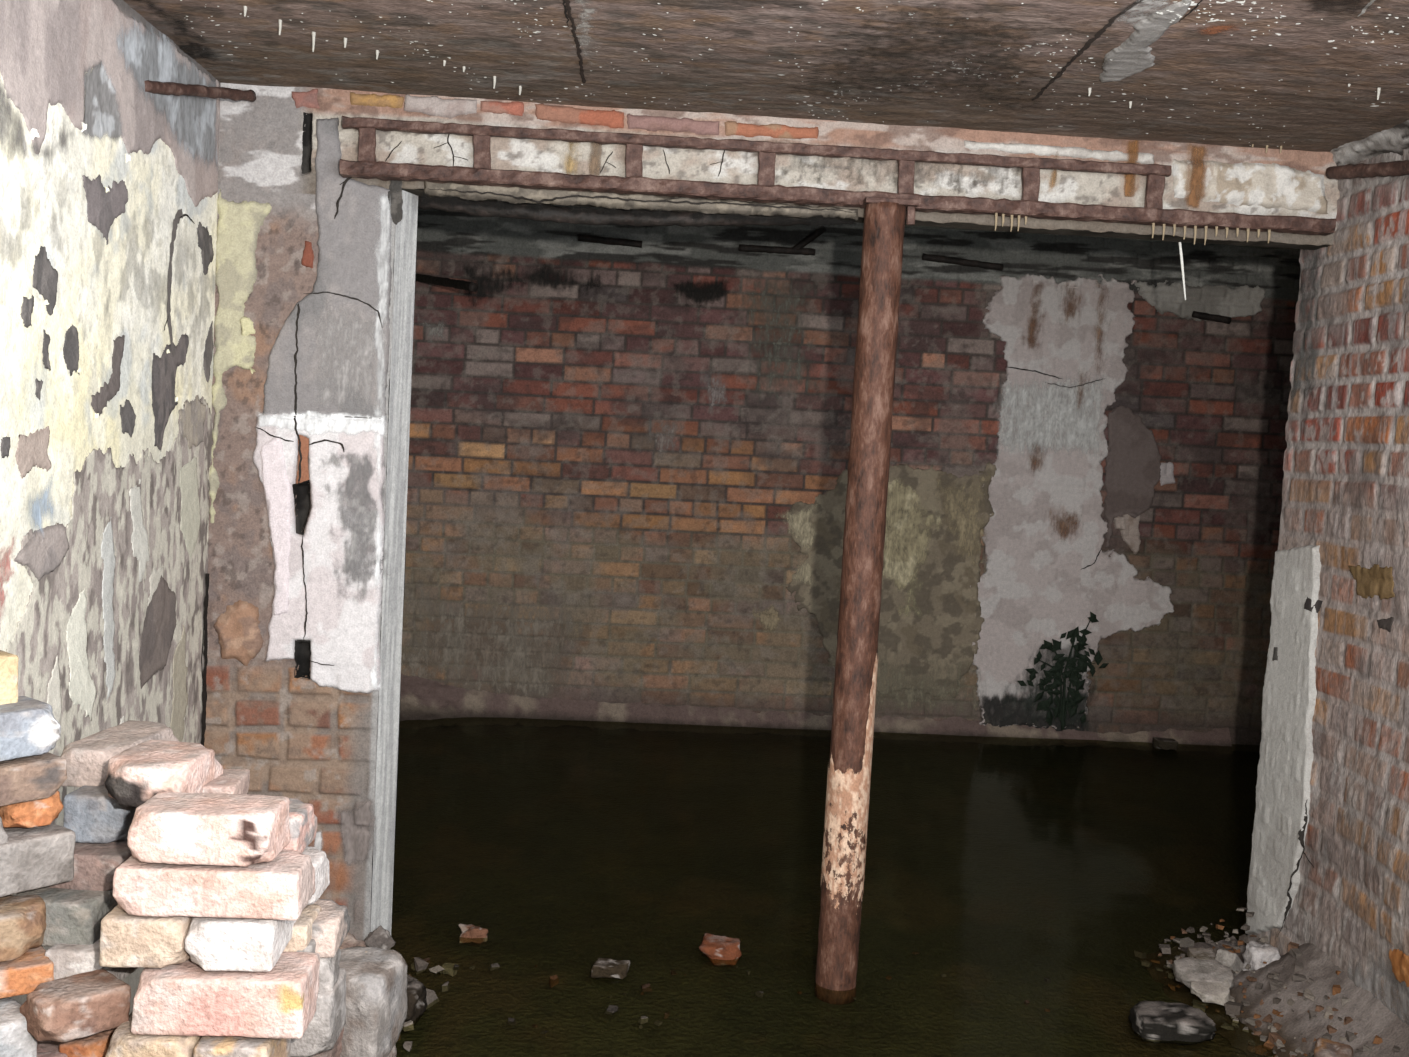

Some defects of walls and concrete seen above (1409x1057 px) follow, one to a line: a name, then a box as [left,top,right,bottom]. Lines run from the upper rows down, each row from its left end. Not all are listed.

crack [563,0,594,83]
crack [1031,0,1203,101]
corrosion [565,142,602,175]
corrosion [1125,140,1138,197]
corrosion [1188,147,1207,207]
peeling [0,0,293,757]
crack [256,292,382,679]
peeling [1113,514,1141,555]
peeling [52,786,80,826]